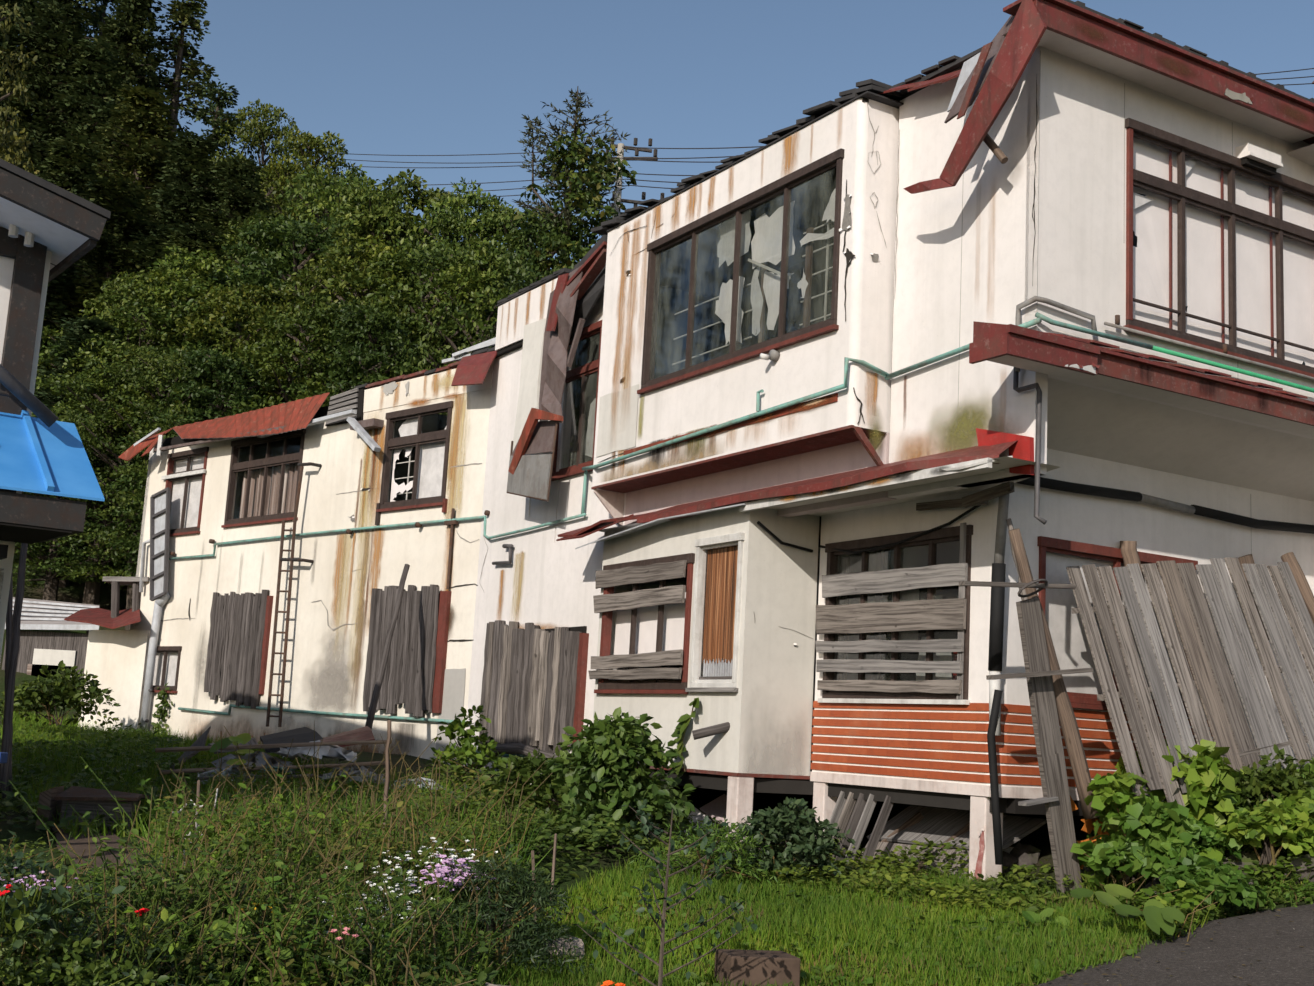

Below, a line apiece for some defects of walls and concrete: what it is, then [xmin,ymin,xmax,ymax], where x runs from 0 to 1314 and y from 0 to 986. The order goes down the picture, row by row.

corrosion [613,168,732,398]
corrosion [784,133,797,171]
crack [843,230,855,321]
crack [846,103,900,298]
corrosion [334,426,385,689]
corrosion [395,370,466,591]
leakage [310,639,348,710]